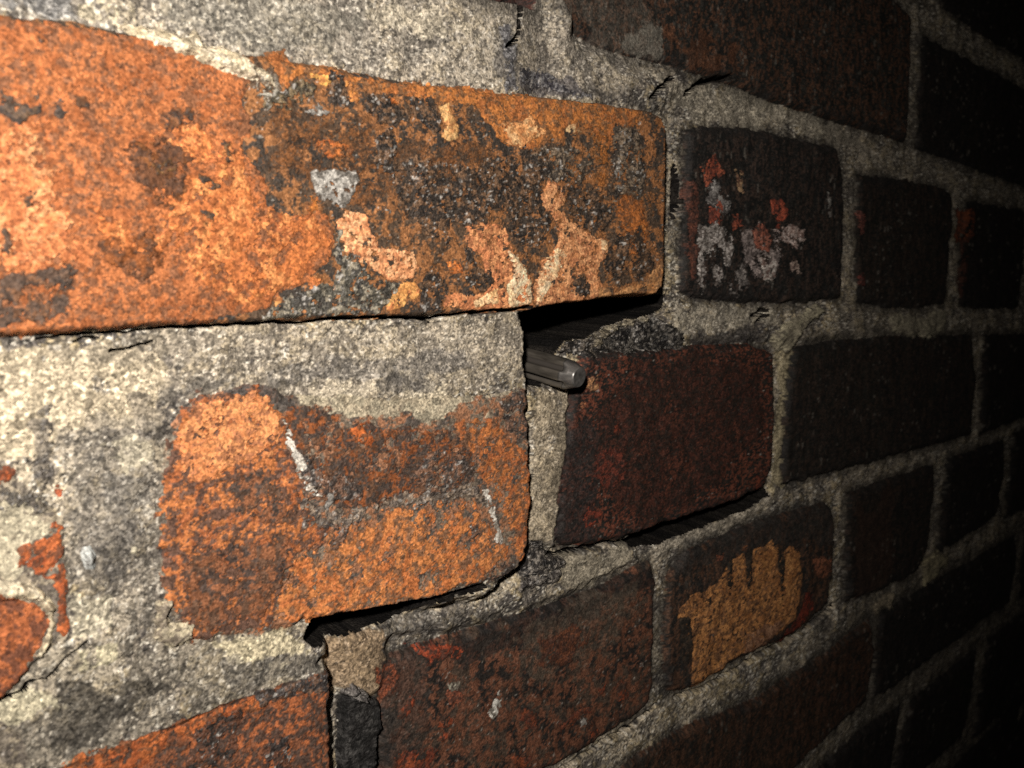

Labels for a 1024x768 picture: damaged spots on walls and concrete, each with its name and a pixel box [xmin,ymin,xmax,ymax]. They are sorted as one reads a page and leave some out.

crack [36,305,533,352]
crack [546,539,621,555]